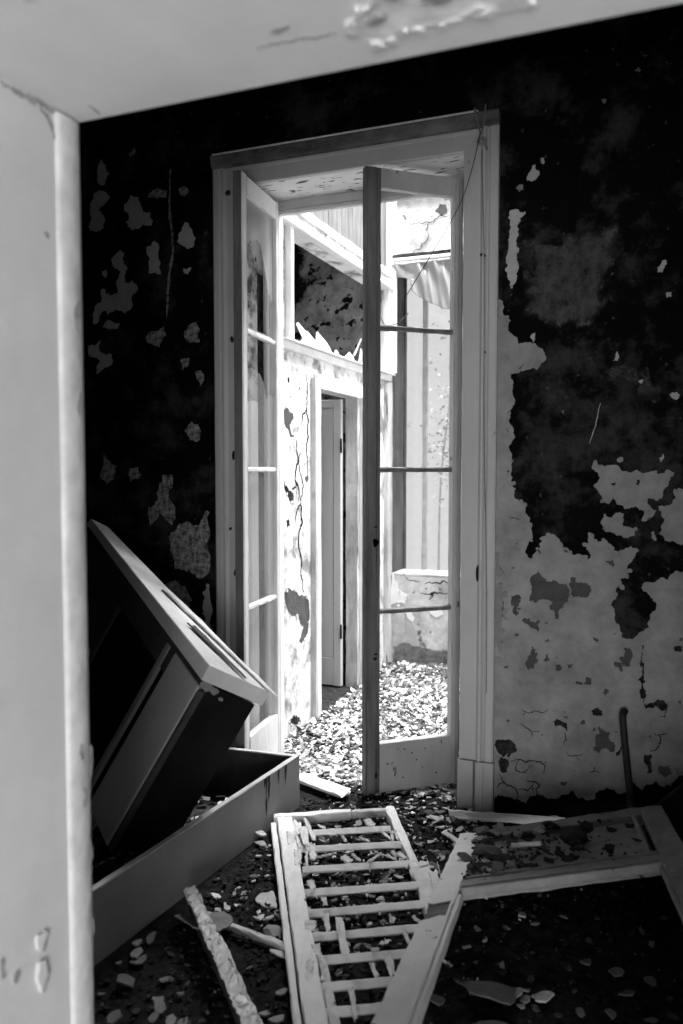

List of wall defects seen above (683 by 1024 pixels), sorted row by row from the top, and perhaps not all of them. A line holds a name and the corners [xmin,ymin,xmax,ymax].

peeling [344,0,538,51]
peeling [516,158,545,192]
peeling [505,209,526,288]
peeling [93,250,138,329]
flaking render [284,408,294,437]
flaking render [284,481,294,504]
crack [292,374,309,592]
peeling [148,475,213,631]
flaking render [285,588,310,643]
crack [406,577,448,600]
peeling [484,299,683,803]
crack [497,709,600,808]